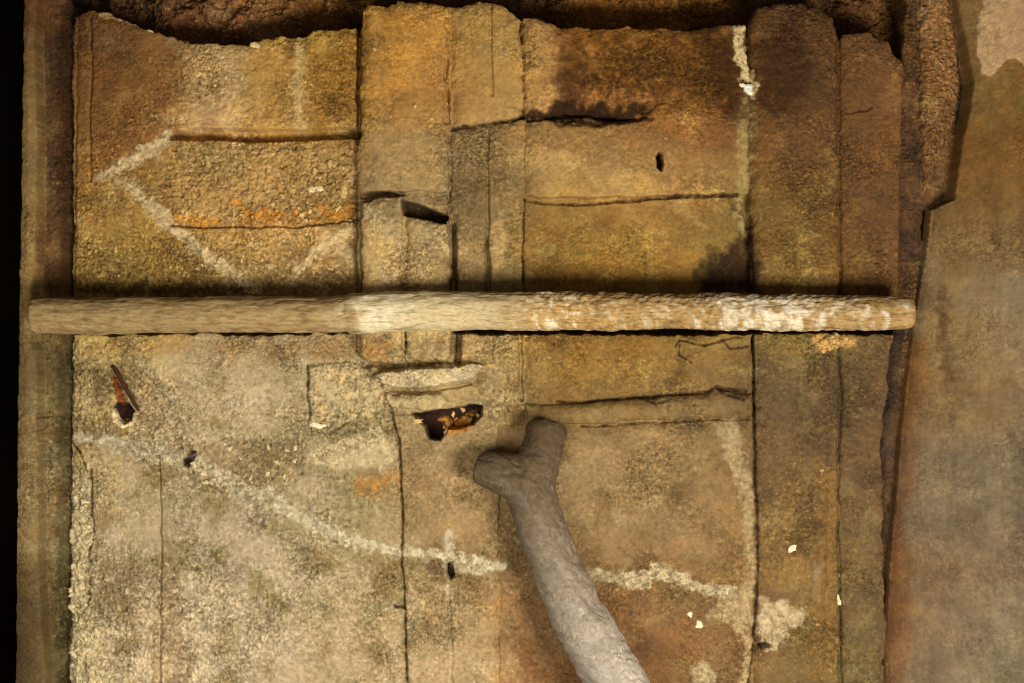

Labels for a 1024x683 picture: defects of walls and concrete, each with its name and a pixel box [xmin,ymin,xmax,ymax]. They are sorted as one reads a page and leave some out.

damp [520,100,648,125]
damp [733,24,760,231]
rust [167,214,219,227]
rust [228,195,354,226]
peeling [443,407,480,435]